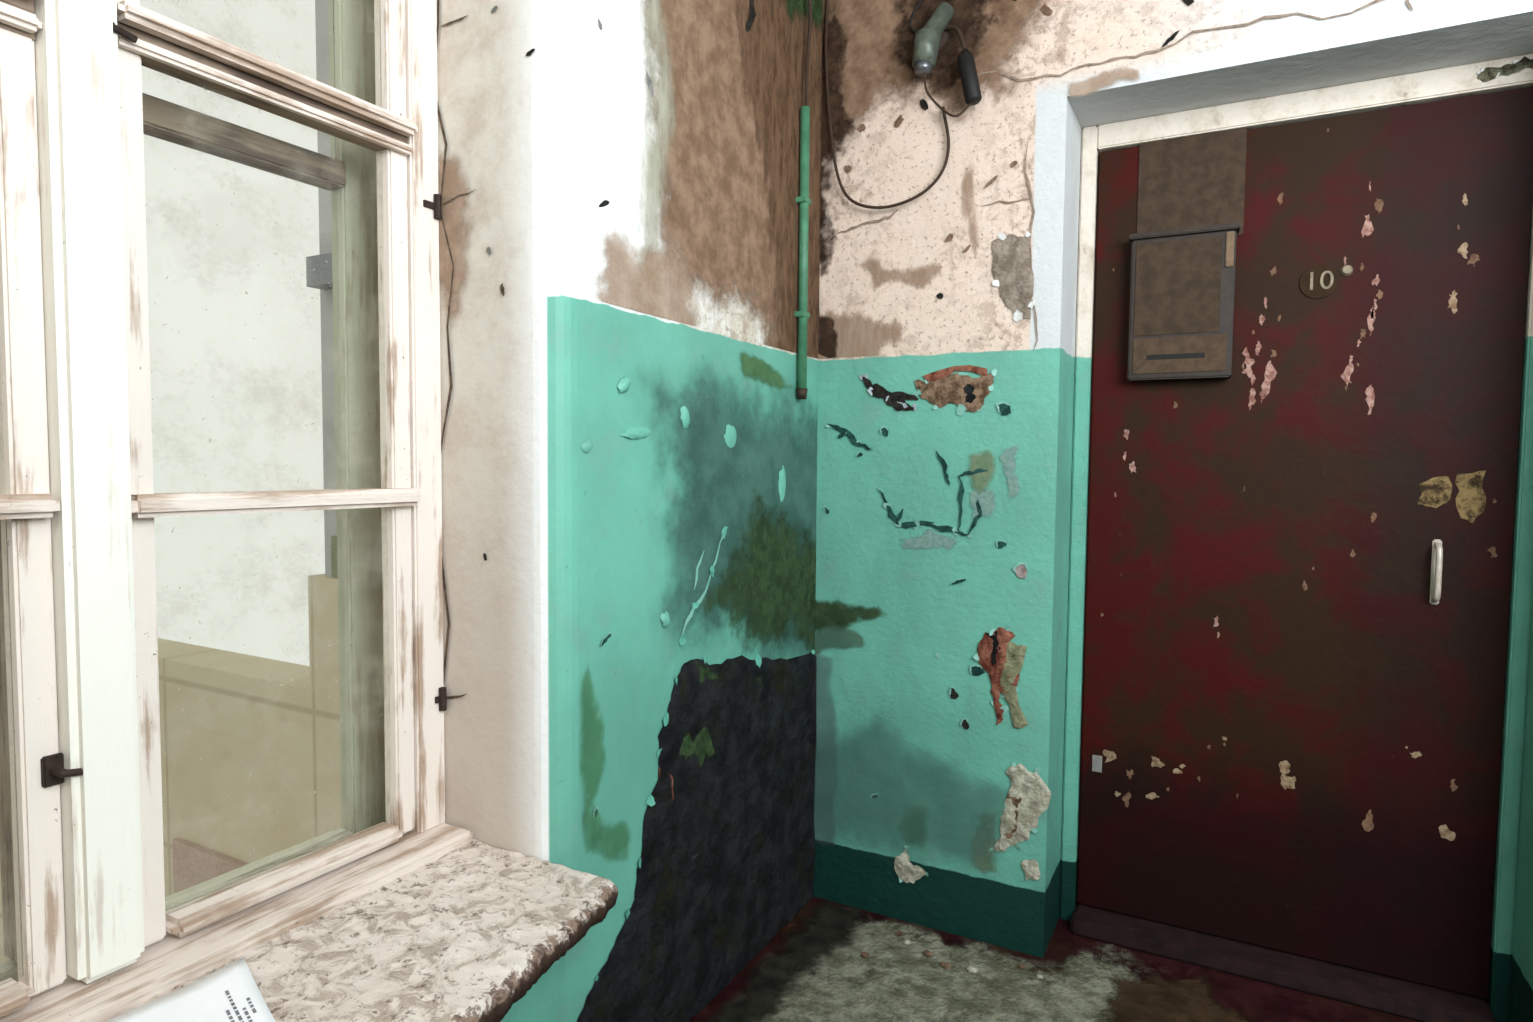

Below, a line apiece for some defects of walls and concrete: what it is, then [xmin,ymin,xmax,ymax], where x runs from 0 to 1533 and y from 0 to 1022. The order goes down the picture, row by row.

crack [958,0,1413,82]
flaking render [991,231,1035,321]
crack [859,374,918,411]
flaking render [912,365,1011,416]
crack [826,424,873,450]
damp [657,381,818,624]
crack [878,451,988,538]
flaking render [969,626,1029,728]
flaking render [577,526,817,1022]
flaking render [894,845,928,884]
flaking render [989,762,1052,881]